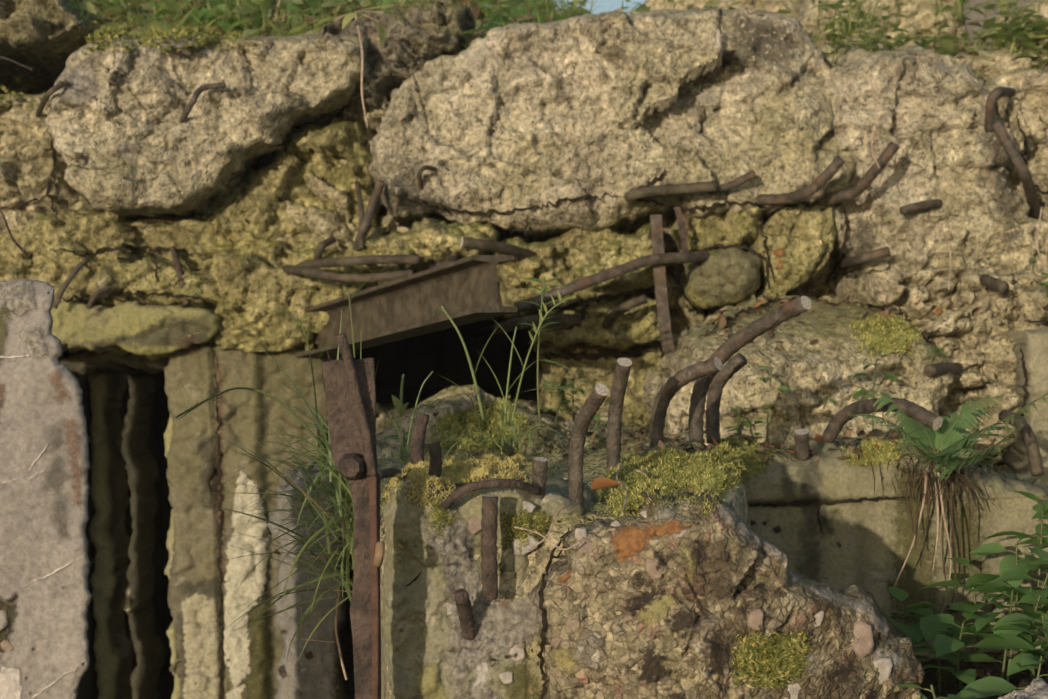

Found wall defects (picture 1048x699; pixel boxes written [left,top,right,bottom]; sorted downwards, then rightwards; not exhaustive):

crack [0,124,214,303]
crack [400,169,850,339]
crack [1019,347,1029,416]
crack [980,443,1014,464]
corrosion [610,520,691,563]
spalling [0,596,22,699]
crack [537,528,569,699]